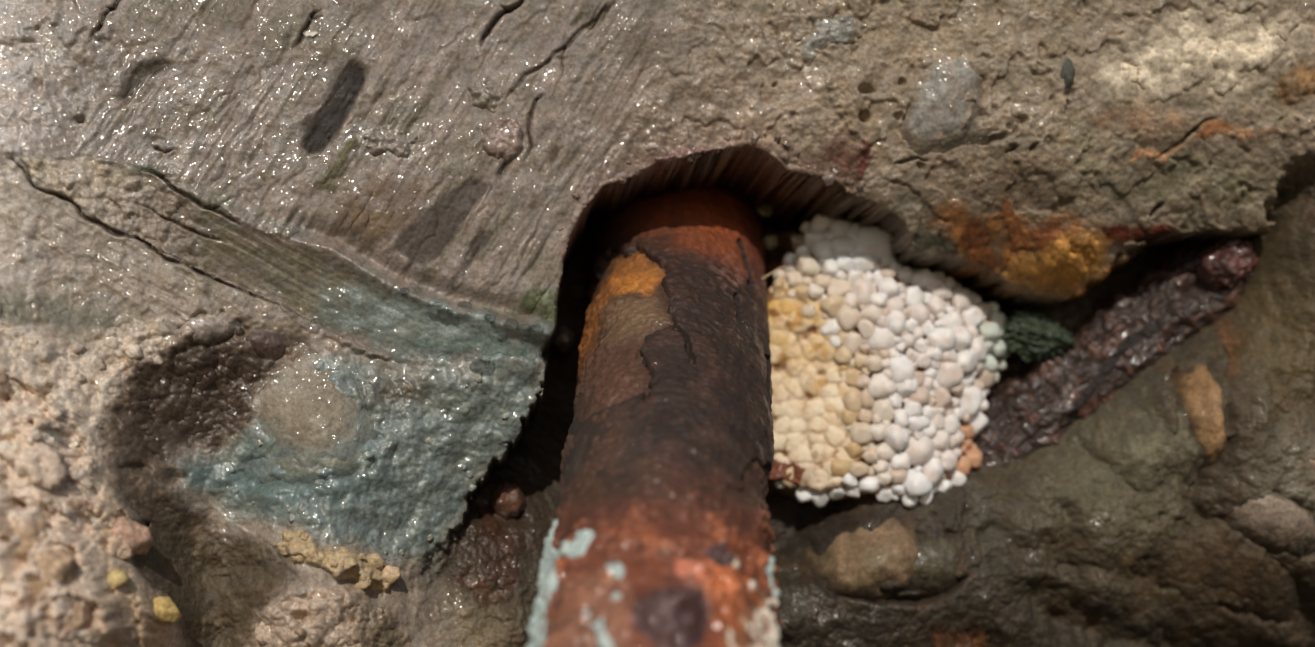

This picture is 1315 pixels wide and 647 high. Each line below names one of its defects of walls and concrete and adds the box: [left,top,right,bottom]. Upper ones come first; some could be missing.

corrosion [1129,148,1171,162]
corrosion [1198,120,1273,139]
crack [12,148,279,305]
spalling [554,131,866,324]
damp [908,228,957,259]
corrosion [937,199,1086,282]
corrosion [1102,224,1171,242]
corrosion [971,237,1254,470]
corrosion [456,480,522,601]
peeling [605,562,625,601]
corrosion [631,541,736,647]
spalling [727,443,1315,647]